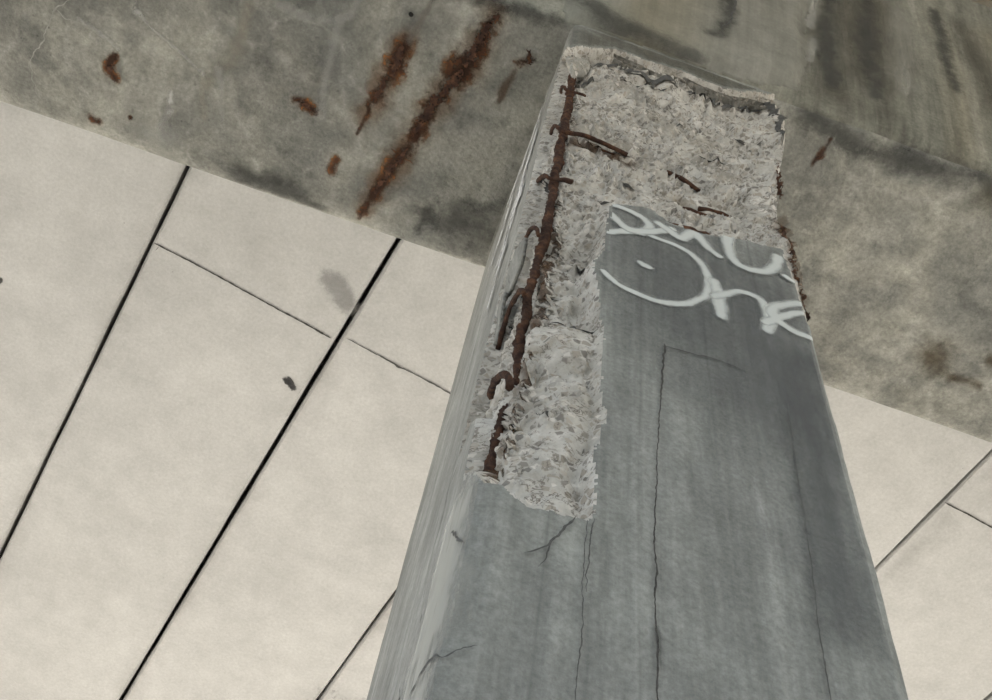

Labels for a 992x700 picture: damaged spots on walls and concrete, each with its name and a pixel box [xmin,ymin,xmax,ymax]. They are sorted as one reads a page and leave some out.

crack [714,0,737,36]
corrosion [102,52,120,83]
corrosion [355,6,501,219]
leakage [800,109,992,195]
spalling [458,46,807,521]
crack [398,645,475,700]